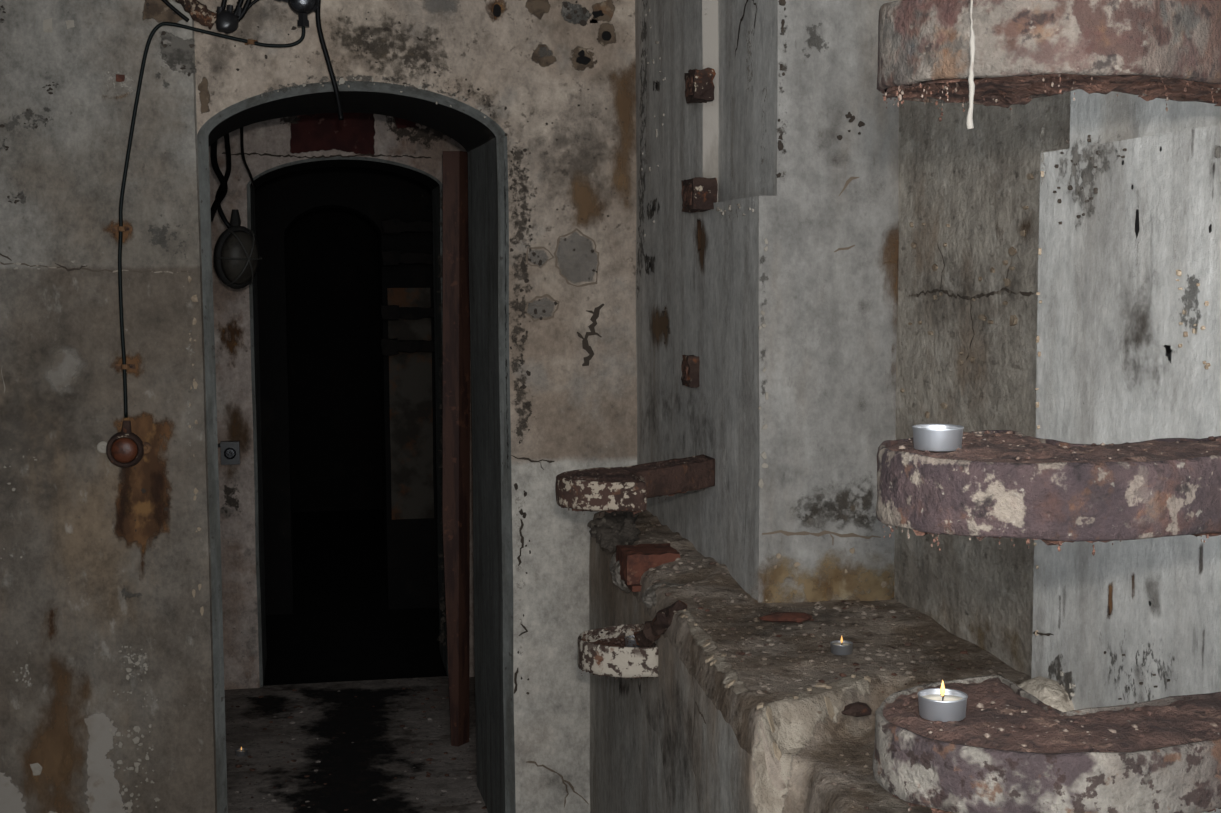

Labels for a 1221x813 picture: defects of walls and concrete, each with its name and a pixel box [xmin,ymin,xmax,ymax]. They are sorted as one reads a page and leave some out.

crack [735,0,757,55]
damp [544,122,609,225]
damp [578,64,636,206]
rust [883,78,969,121]
flaking render [504,147,600,467]
crack [577,304,604,366]
crack [909,243,1034,360]
rust [114,412,174,576]
damp [762,547,895,623]
peeling [0,772,26,813]
peeling [30,763,42,776]
peeling [84,712,160,813]